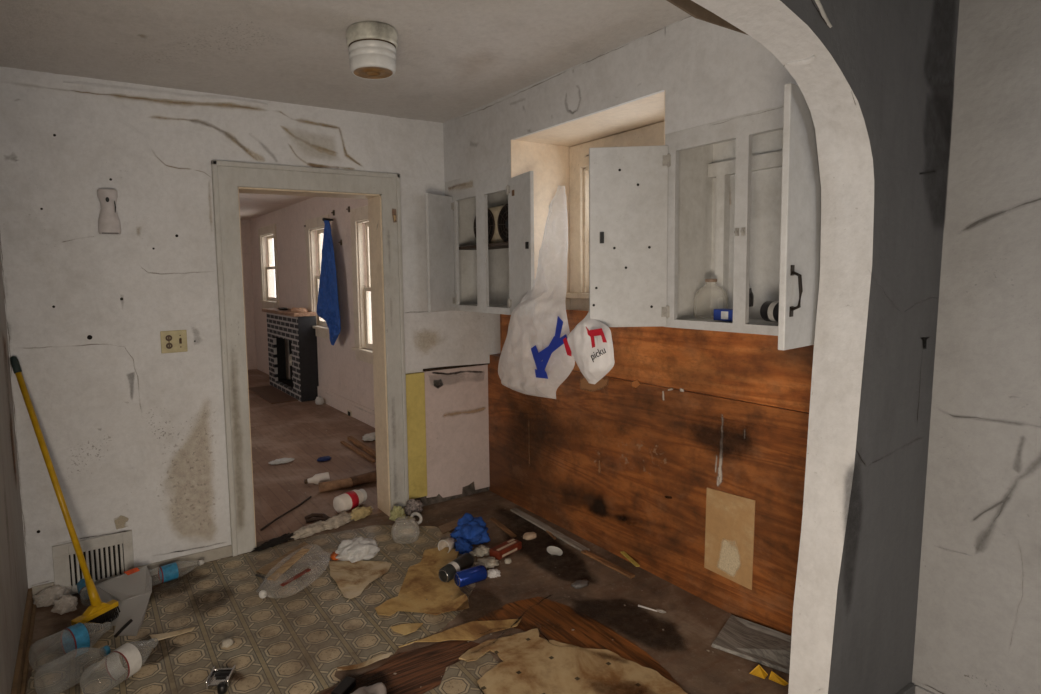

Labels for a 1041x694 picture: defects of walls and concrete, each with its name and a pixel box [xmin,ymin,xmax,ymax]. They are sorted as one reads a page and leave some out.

crack [55,73,360,165]
crack [966,198,1041,229]
crack [974,498,1009,549]